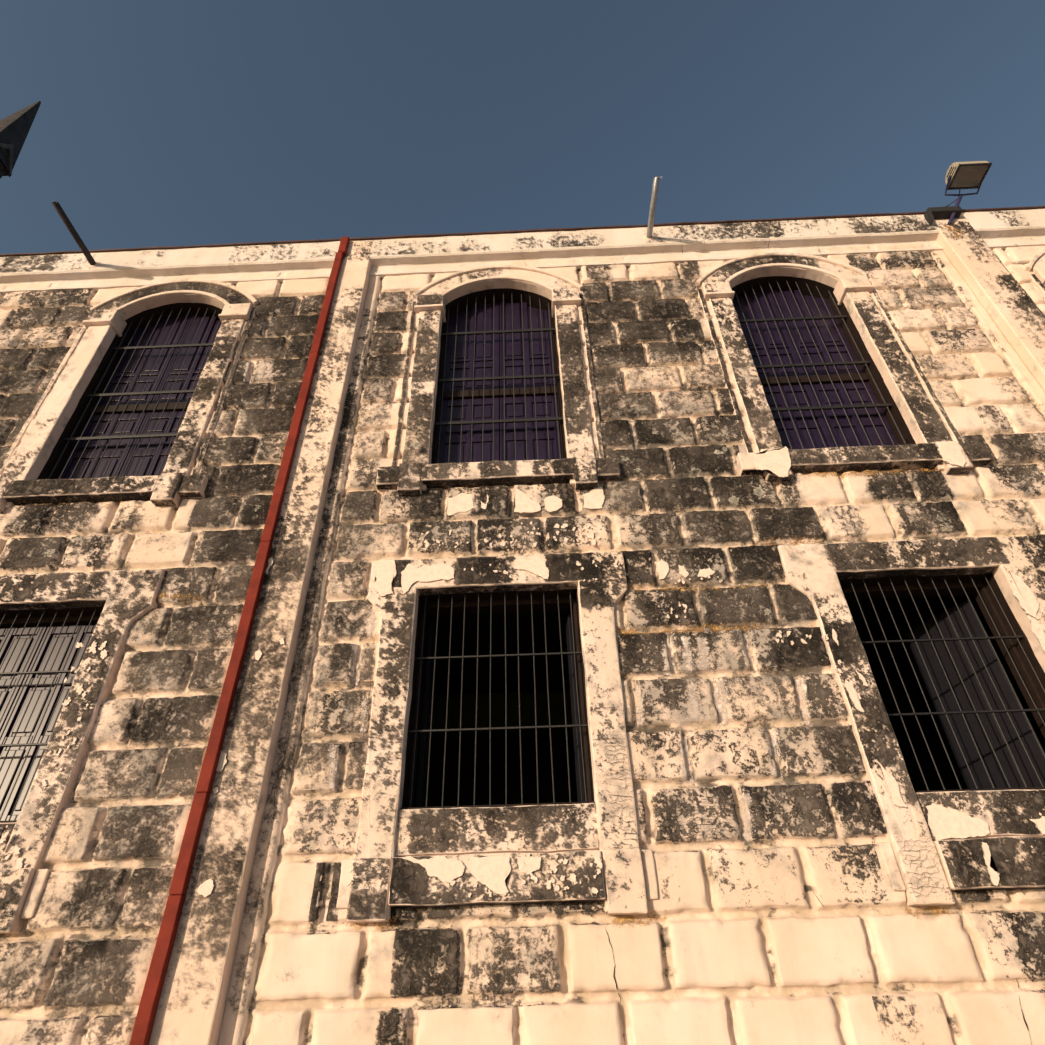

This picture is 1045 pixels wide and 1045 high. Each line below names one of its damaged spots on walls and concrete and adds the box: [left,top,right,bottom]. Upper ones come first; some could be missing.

damp [229,244,298,262]
damp [312,235,490,260]
damp [512,230,605,249]
damp [649,215,1045,348]
peeling [582,487,605,509]
peeling [489,489,600,580]
peeling [372,559,474,597]
damp [0,250,1045,1045]
peeling [926,803,1000,886]
peeling [1030,813,1045,834]
peeling [402,854,602,898]
crack [605,928,621,1002]